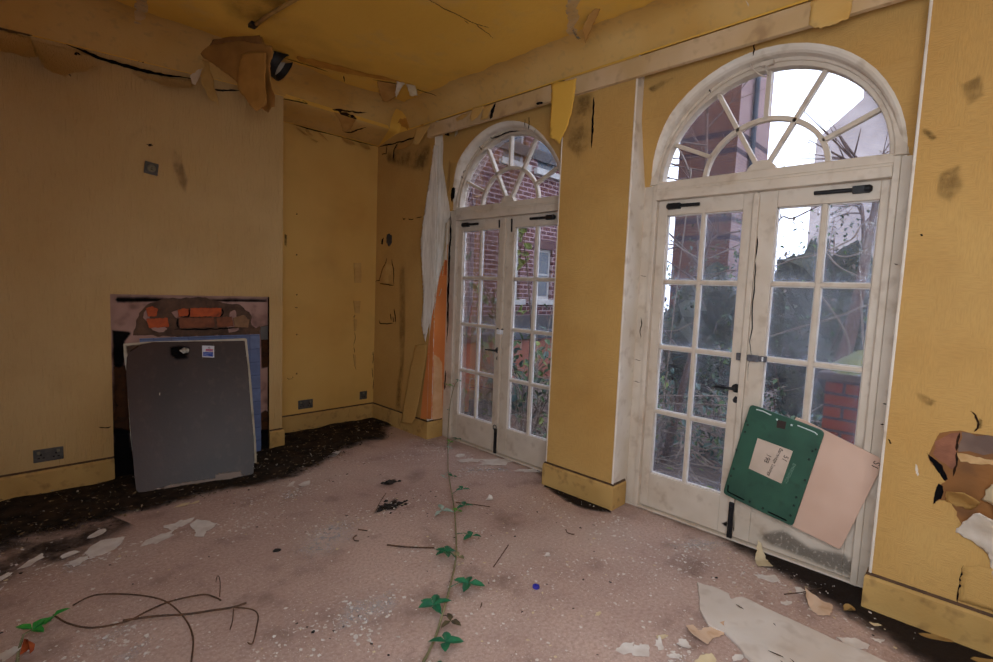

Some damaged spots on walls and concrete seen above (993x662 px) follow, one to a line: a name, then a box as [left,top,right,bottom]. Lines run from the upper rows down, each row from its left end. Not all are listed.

crack [430,0,493,38]
crack [66,44,191,79]
peeling [395,81,418,98]
peeling [945,484,993,611]